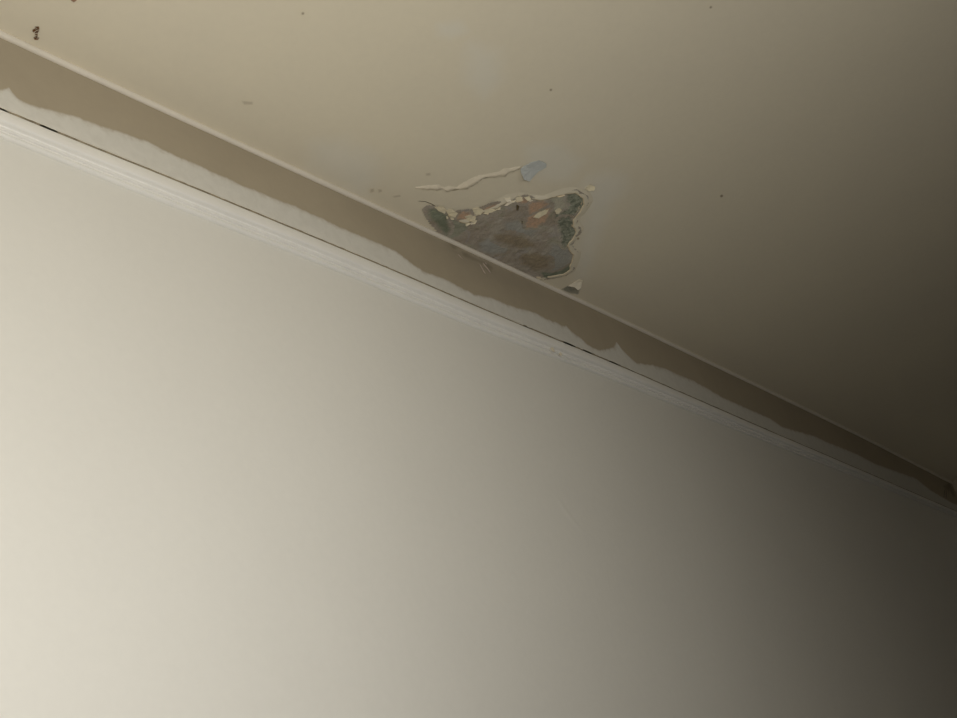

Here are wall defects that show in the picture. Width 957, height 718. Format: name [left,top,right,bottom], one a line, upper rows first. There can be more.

water stain [446,242,495,274]
peeling [0,85,957,511]